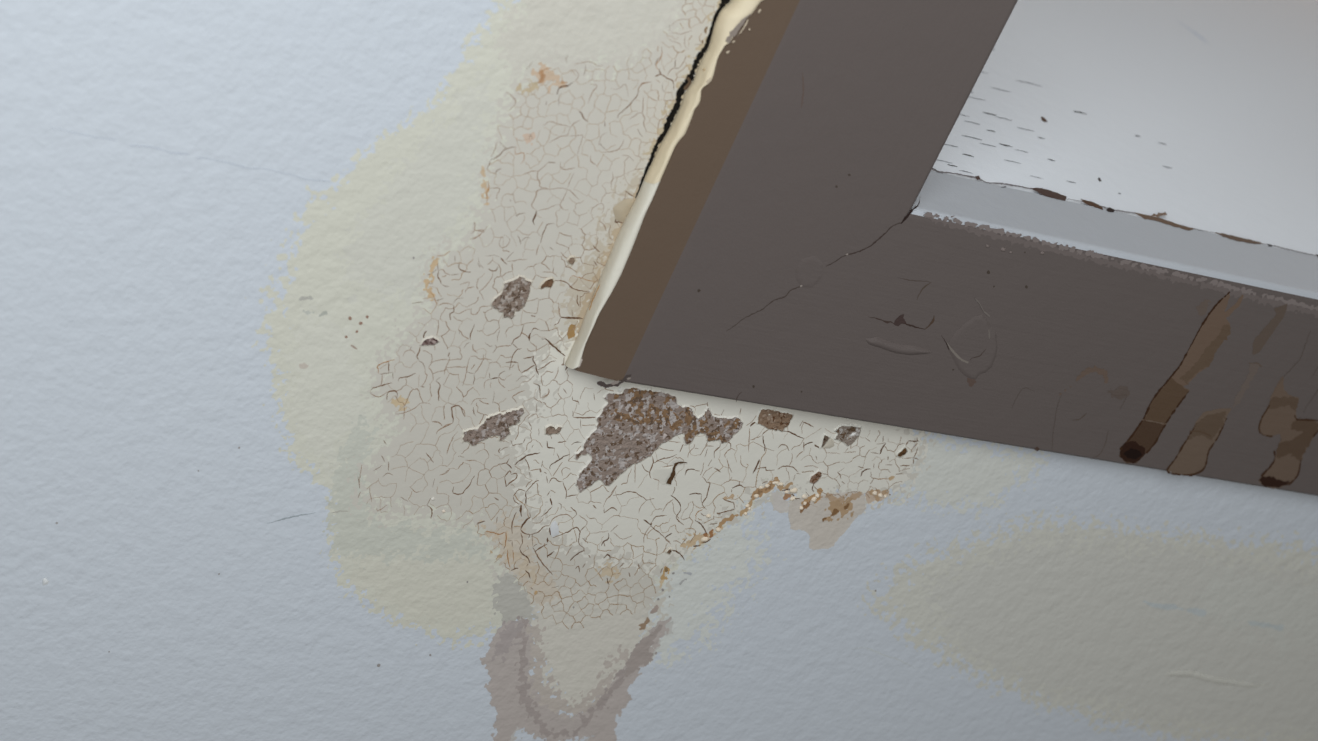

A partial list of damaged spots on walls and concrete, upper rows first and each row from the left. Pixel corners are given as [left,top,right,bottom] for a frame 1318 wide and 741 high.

flaking render [461,405,525,446]
flaking render [490,274,555,319]
crack [332,0,937,706]
leakage [251,0,1051,741]
flaking render [573,385,794,493]
leakage [1092,291,1244,463]
leakage [1166,408,1231,477]
leakage [1258,331,1318,489]
leakage [857,506,1318,741]